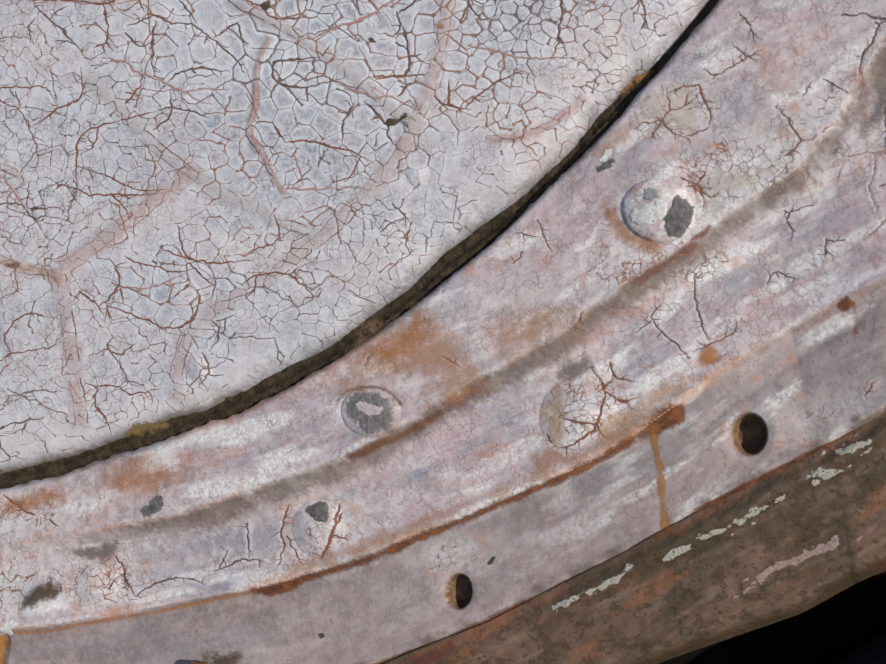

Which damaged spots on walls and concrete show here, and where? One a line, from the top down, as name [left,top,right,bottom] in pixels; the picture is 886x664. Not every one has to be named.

crack [0,0,886,462]
peeling [630,188,694,238]
corrosion [838,296,855,311]
peeling [822,434,872,456]
peeling [806,465,852,486]
peeling [305,501,329,522]
corrosion [251,386,886,664]
peeling [662,494,785,562]
crack [0,555,35,621]
crack [430,545,478,571]
peeling [552,563,633,611]
peeling [733,535,839,598]